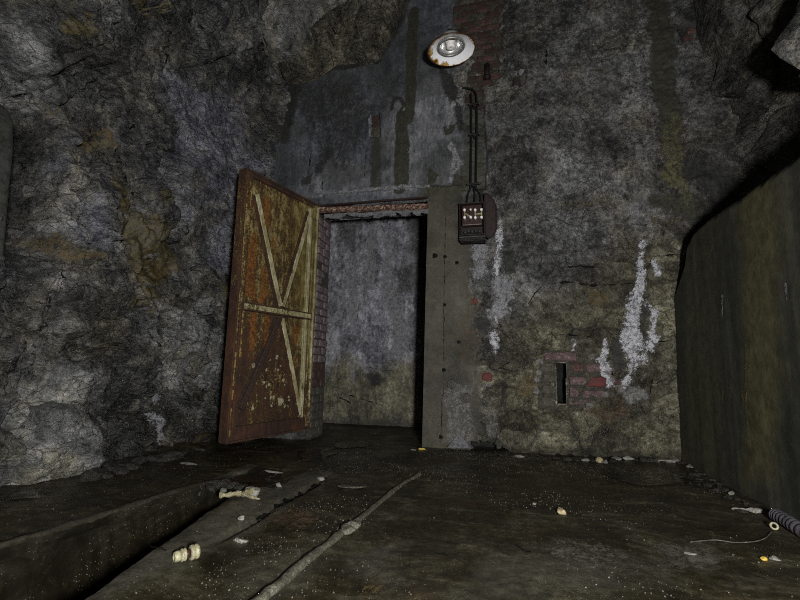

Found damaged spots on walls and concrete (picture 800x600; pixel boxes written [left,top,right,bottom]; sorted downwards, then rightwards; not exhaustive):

spalling [452,0,526,111]
water stain [469,218,524,353]
spalling [533,350,622,410]
water stain [595,240,661,389]